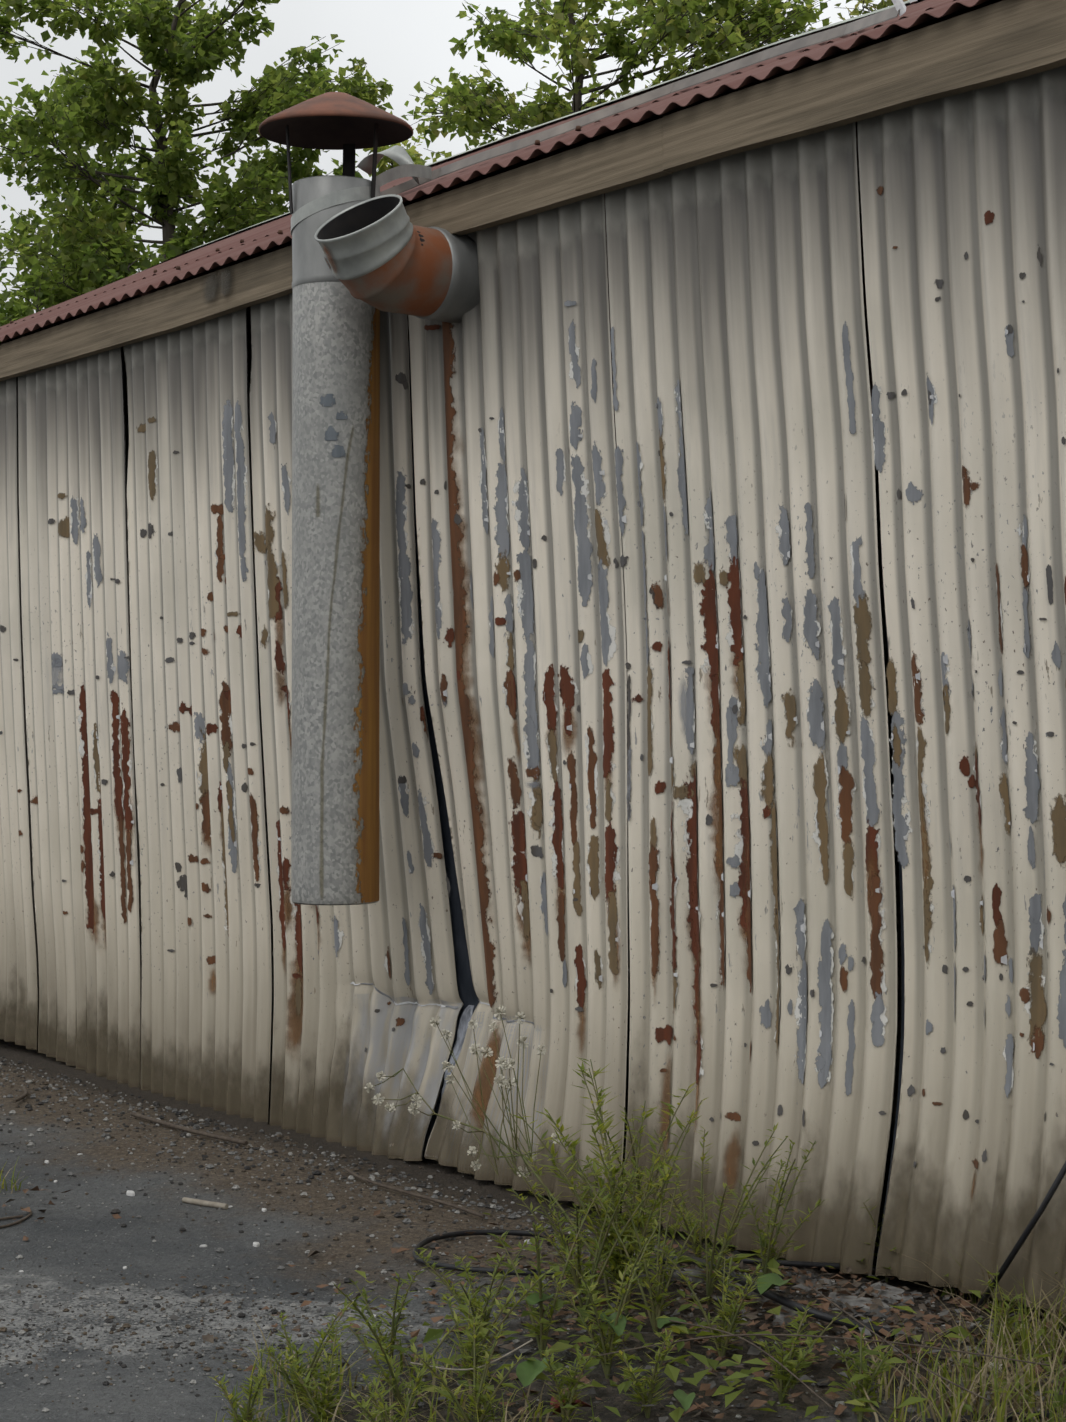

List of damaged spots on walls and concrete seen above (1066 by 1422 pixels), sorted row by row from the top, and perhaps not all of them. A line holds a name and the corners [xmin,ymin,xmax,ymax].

rust [78,685,134,939]
peeling [160,681,263,900]
rust [352,308,380,903]
rust [424,322,498,1008]
peeling [469,407,548,937]
water stain [0,1001,1066,1315]
rust [542,663,587,1049]
rust [655,754,741,1122]
rust [725,744,752,993]
peeling [555,300,986,1096]
peeling [998,515,1066,869]
peeling [1019,894,1066,1066]